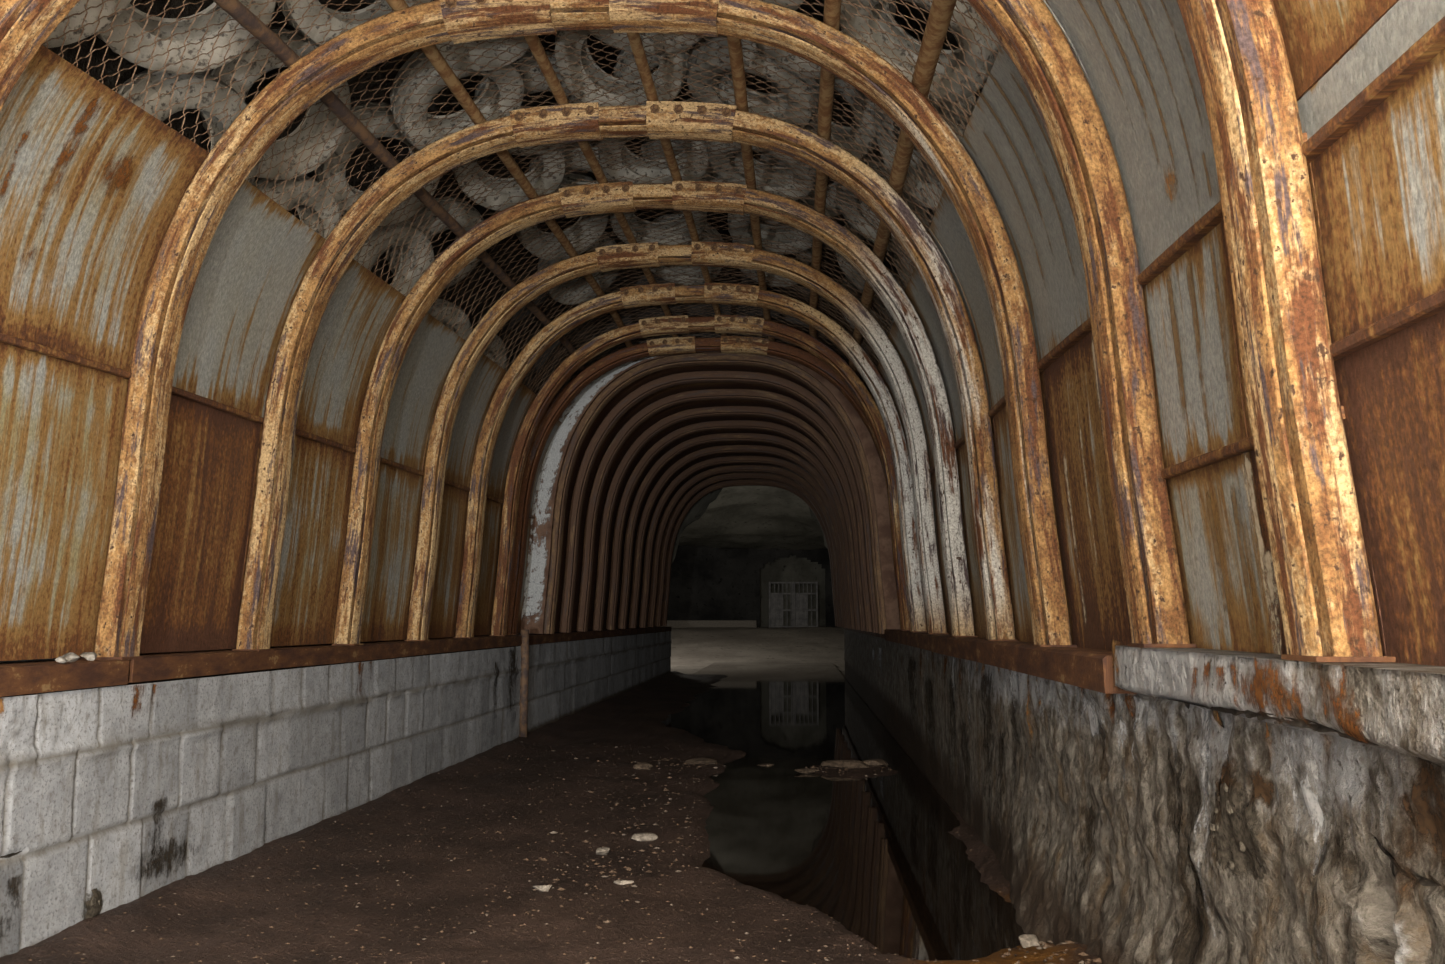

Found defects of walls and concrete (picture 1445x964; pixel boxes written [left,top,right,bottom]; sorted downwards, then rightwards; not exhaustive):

corrosion [0,131,30,195]
corrosion [36,96,101,225]
corrosion [103,150,133,196]
corrosion [1077,0,1212,202]
corrosion [1166,262,1207,420]
corrosion [1209,241,1230,390]
corrosion [1186,486,1368,757]
water stain [0,877,20,938]